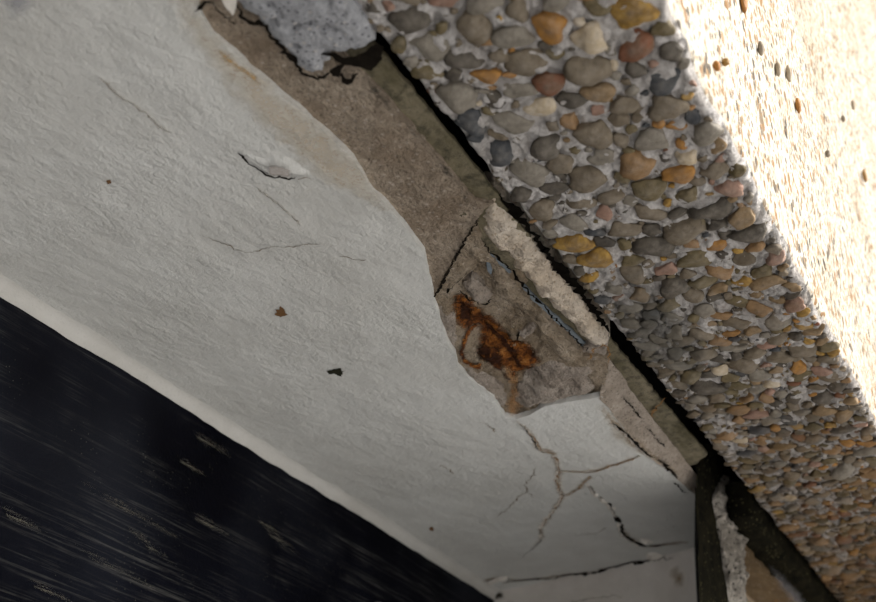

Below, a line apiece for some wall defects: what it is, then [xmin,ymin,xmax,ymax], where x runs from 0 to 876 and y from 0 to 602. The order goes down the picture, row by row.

peeling [199,0,609,414]
rust [454,294,539,412]
crack [484,398,688,585]